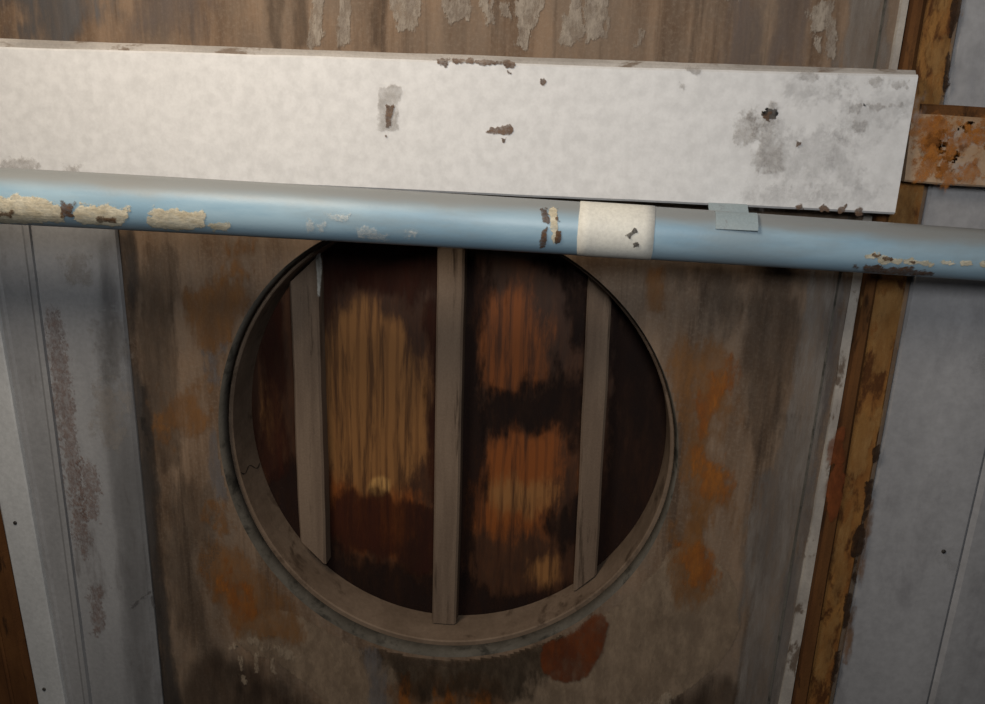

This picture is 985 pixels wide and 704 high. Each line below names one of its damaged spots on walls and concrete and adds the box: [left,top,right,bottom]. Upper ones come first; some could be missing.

peeling [437,57,515,74]
peeling [486,124,513,143]
corrosion [909,112,985,188]
peeling [0,193,131,227]
peeling [147,205,231,232]
peeling [865,252,985,267]
leakage [229,543,741,704]
corrosion [541,615,608,683]